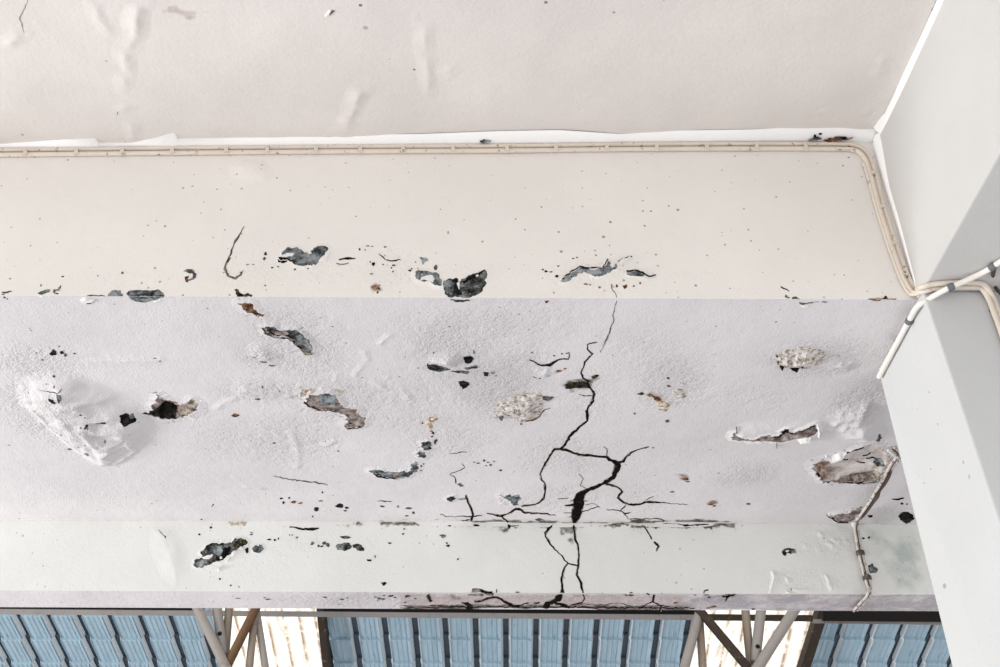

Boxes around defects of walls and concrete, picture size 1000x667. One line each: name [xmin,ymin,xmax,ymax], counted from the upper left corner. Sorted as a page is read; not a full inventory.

spalling [80,289,164,304]
crack [224,226,245,280]
peeling [246,243,332,270]
peeling [408,257,487,302]
peeling [542,256,656,286]
peeling [231,289,323,358]
spalling [129,390,209,424]
peeling [297,386,375,431]
crack [439,287,688,611]
peeling [803,438,901,487]
peeling [191,519,298,599]
crack [639,589,755,611]